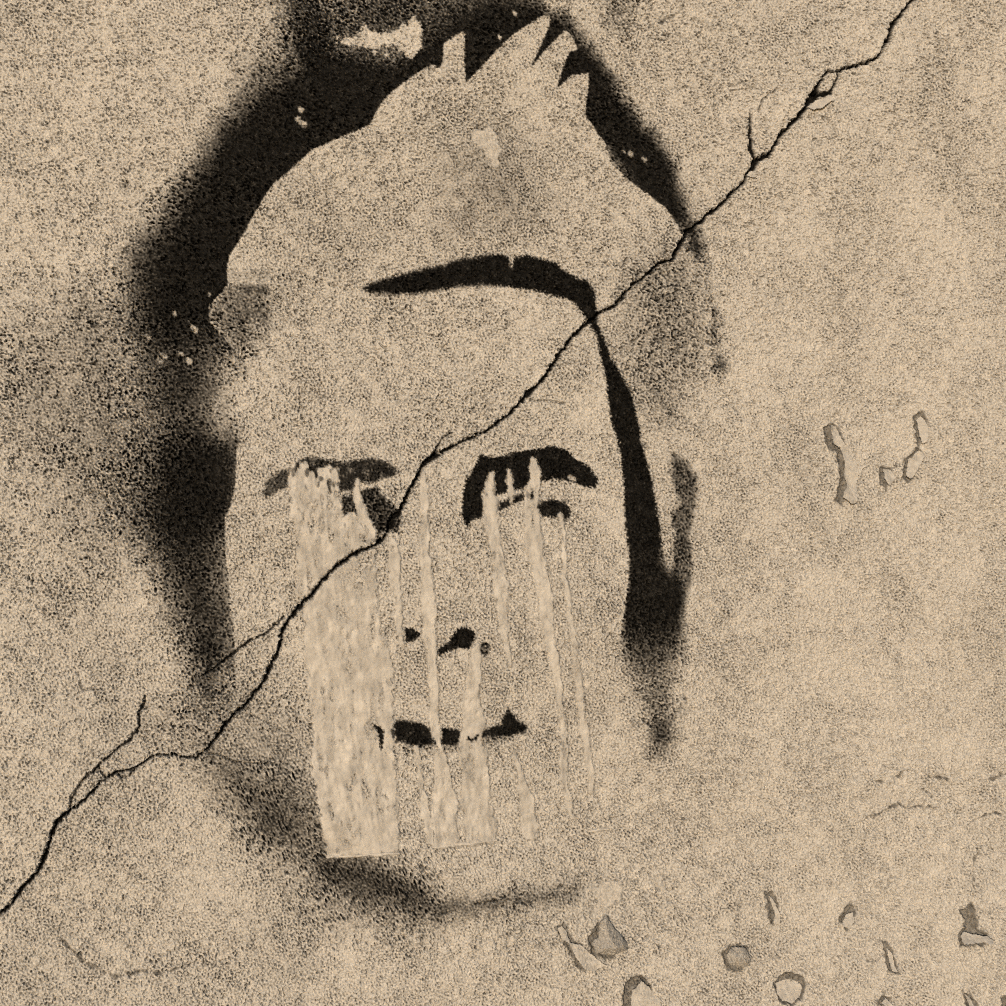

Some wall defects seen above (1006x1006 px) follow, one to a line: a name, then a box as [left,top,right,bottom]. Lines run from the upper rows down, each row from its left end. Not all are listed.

crack [203,0,915,750]
peeling [823,423,859,505]
peeling [879,411,929,491]
crack [0,695,202,914]
peeling [555,915,628,973]
peeling [721,944,752,972]
peeling [764,891,781,924]
peeling [882,941,899,974]
peeling [958,903,994,947]
peeling [622,975,661,1006]
peeling [773,972,805,1006]
peeling [962,990,978,1006]